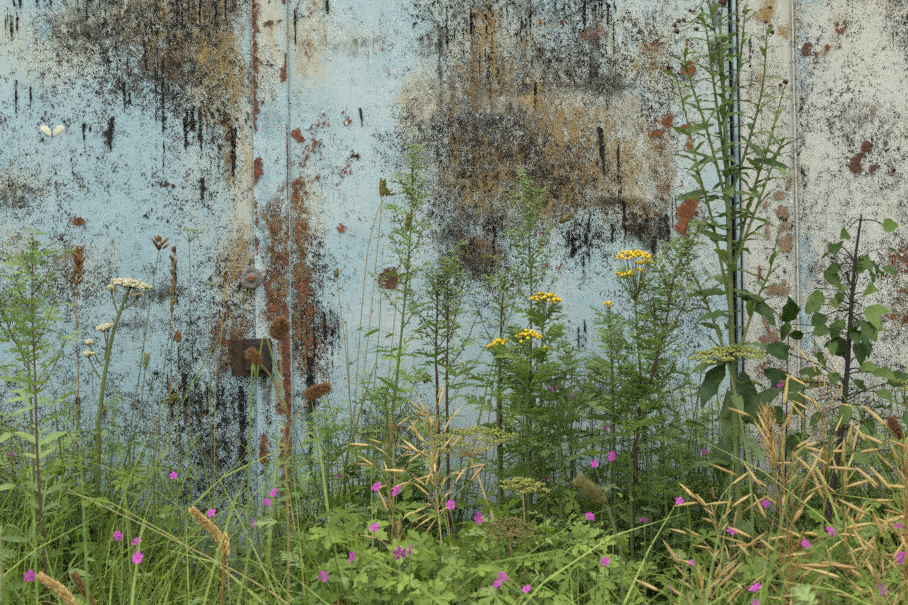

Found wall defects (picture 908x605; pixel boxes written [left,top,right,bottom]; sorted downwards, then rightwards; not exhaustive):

leakage [100,57,134,152]
leakage [142,13,170,174]
leakage [168,0,201,35]
leakage [183,106,249,189]
corrosion [197,0,263,133]
leakage [400,0,689,286]
corrosion [453,36,710,281]
corrosion [583,16,615,81]
corrosion [191,124,351,535]